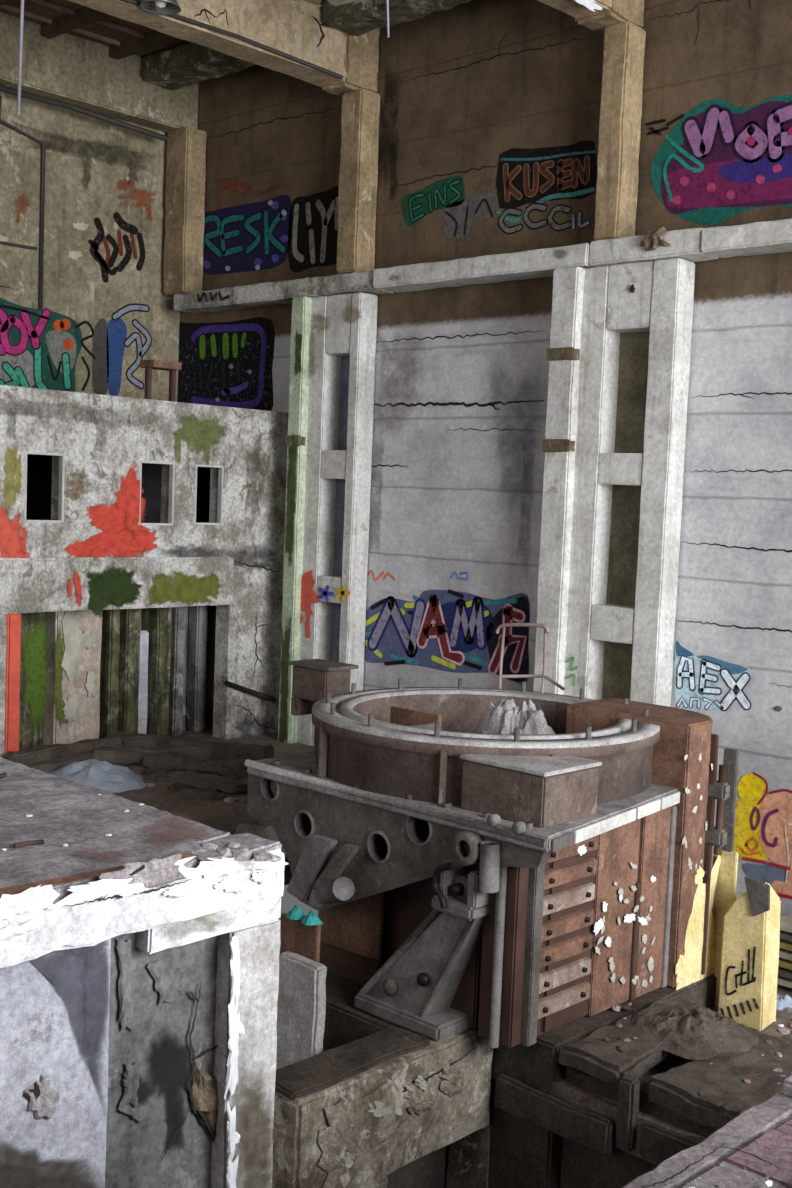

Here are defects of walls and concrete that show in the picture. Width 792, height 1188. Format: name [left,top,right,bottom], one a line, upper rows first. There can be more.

crack [691,391,792,399]
crack [688,467,792,475]
crack [684,541,792,553]
water stain [88,571,165,618]
peeling [0,849,288,940]
water stain [137,1034,192,1149]